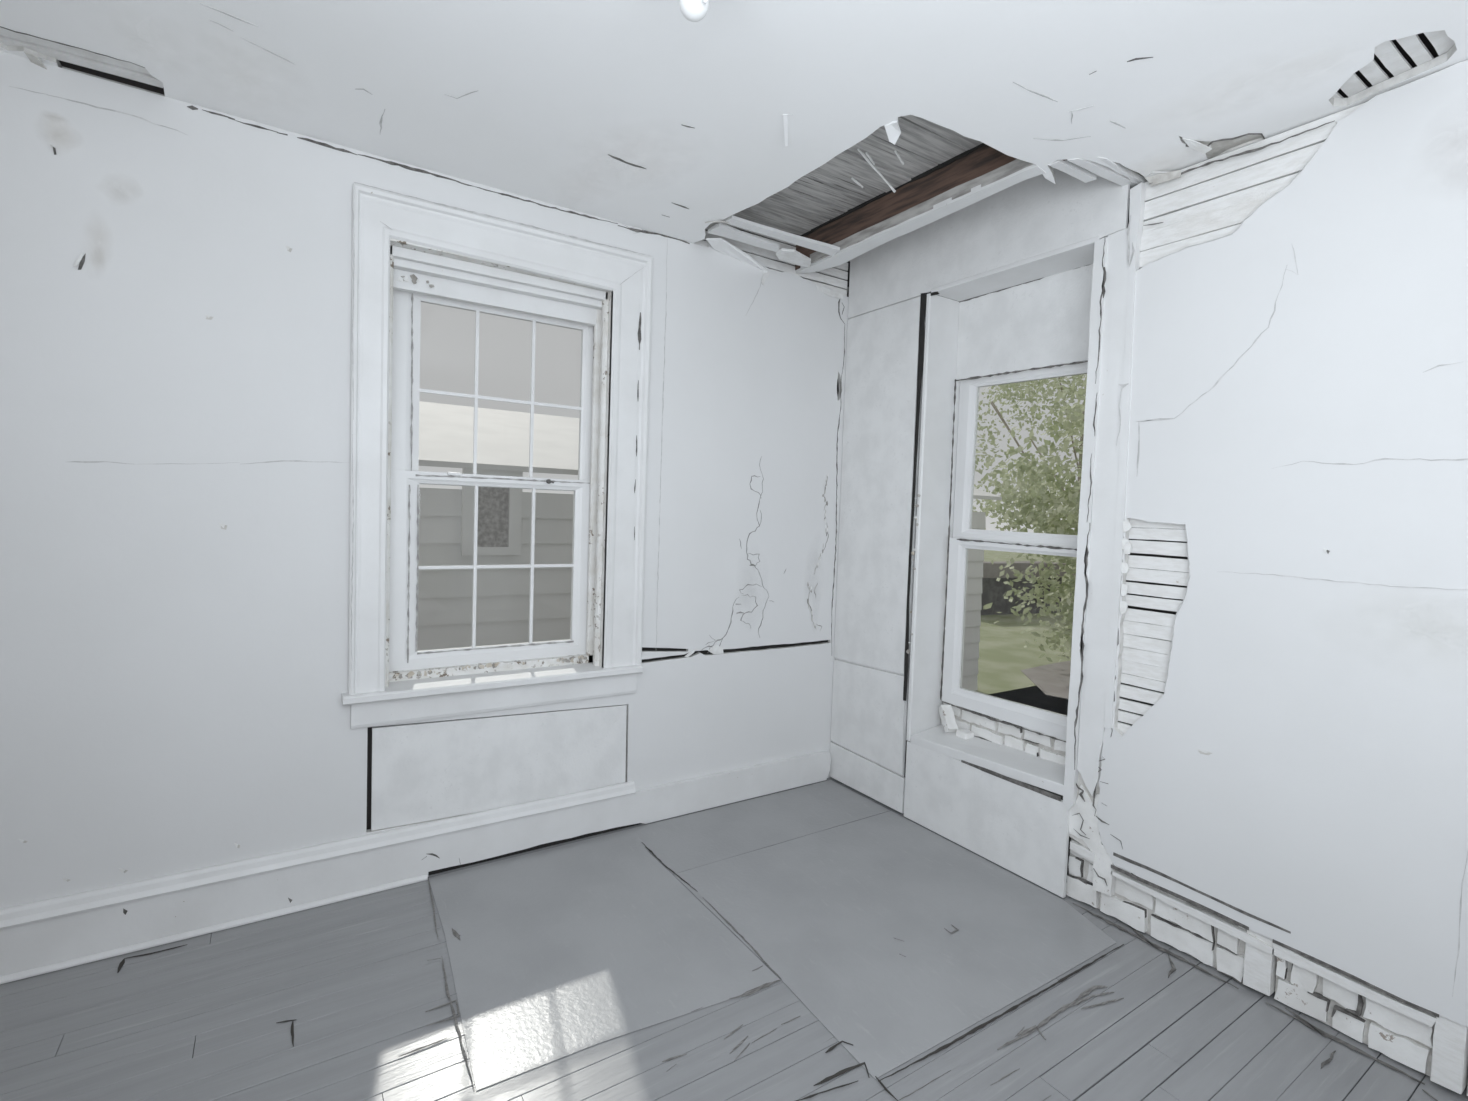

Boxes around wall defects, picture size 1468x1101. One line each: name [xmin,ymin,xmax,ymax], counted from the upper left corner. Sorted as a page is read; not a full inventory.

peeling [884,121,901,145]
spalling [1139,102,1366,269]
spalling [695,217,848,313]
crack [10,86,845,662]
crack [796,216,1468,1101]
spalling [1111,518,1190,735]
flaking render [939,702,1066,765]
flaking render [1066,838,1246,984]
flaking render [1274,957,1435,1076]